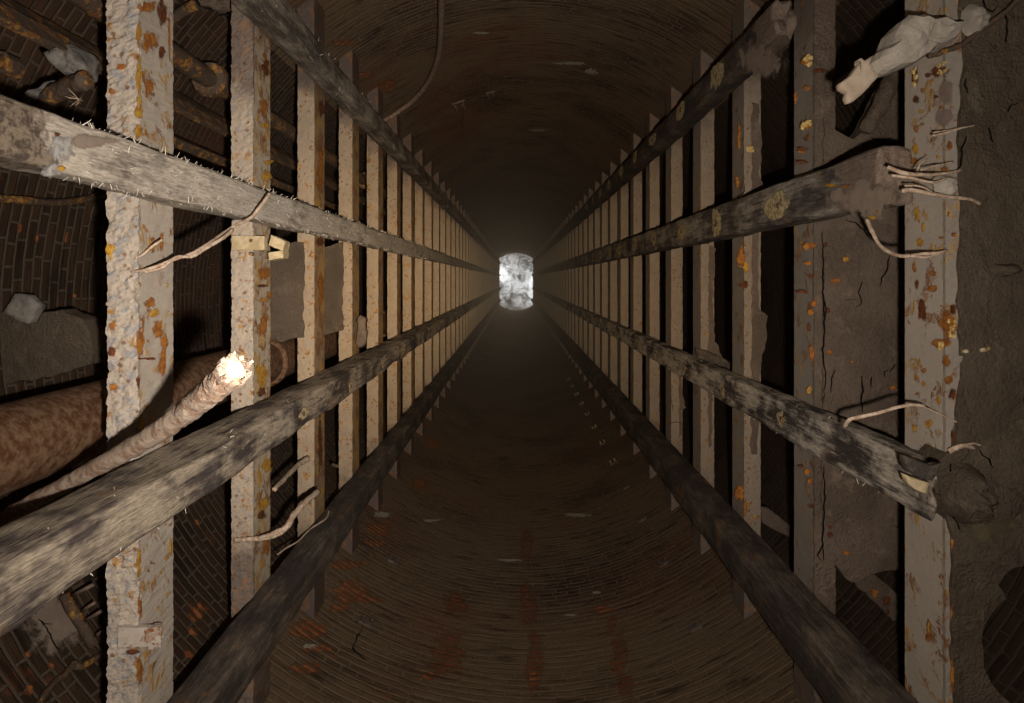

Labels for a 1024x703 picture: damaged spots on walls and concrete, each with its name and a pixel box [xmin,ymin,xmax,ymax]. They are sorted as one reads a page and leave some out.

corrosion [117,0,170,139]
corrosion [801,53,825,73]
corrosion [910,61,949,113]
corrosion [911,126,953,171]
corrosion [257,267,272,336]
corrosion [912,261,937,321]
corrosion [136,297,168,376]
corrosion [256,363,267,397]
crack [817,466,826,563]